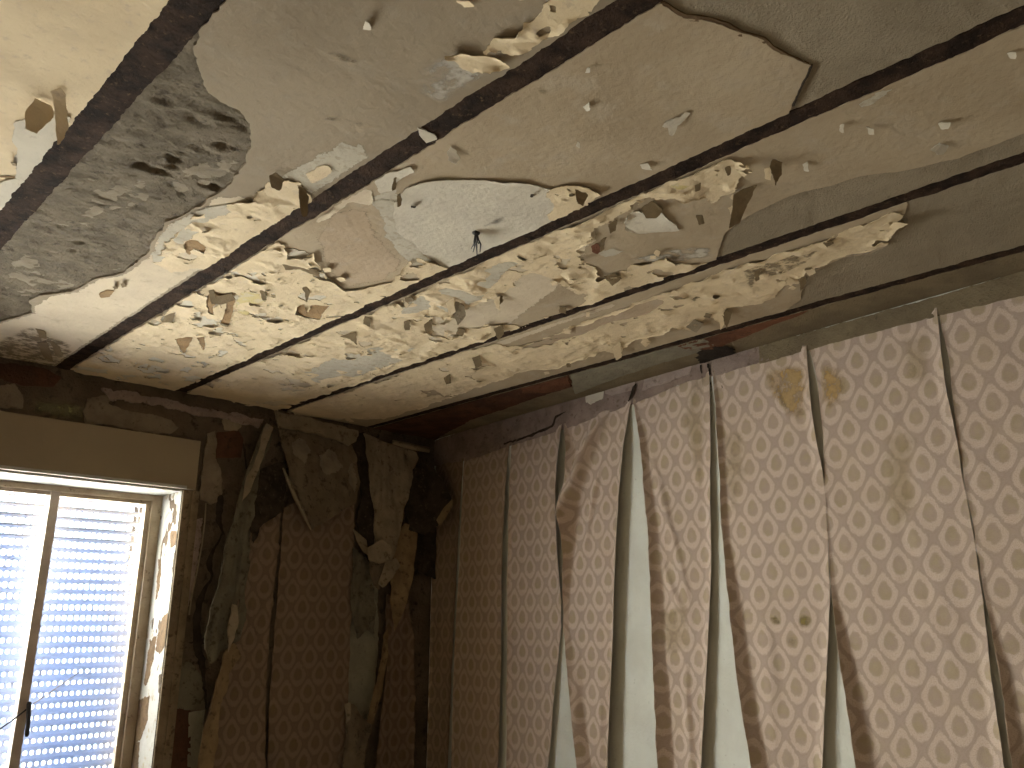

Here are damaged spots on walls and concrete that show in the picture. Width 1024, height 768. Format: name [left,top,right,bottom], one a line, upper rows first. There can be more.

peeling [431,0,599,99]
spalling [663,0,1024,110]
peeling [0,32,1024,466]
peeling [138,491,182,768]
flaking render [348,583,379,719]